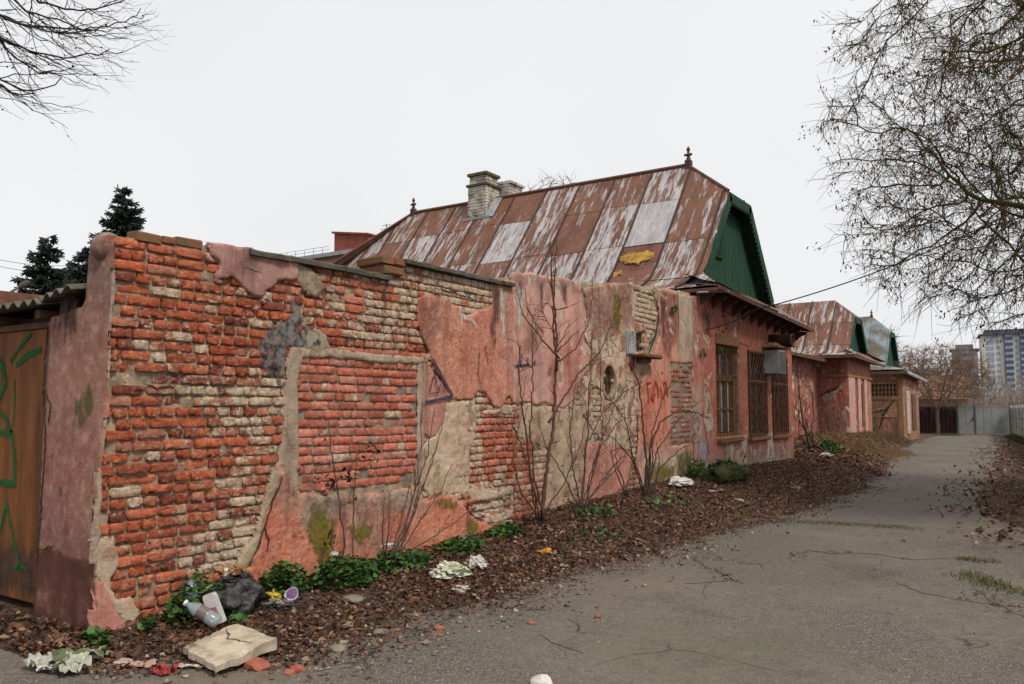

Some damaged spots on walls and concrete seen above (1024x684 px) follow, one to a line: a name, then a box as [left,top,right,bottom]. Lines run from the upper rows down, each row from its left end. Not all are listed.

spalling [88,237,493,621]
peeling [422,282,658,527]